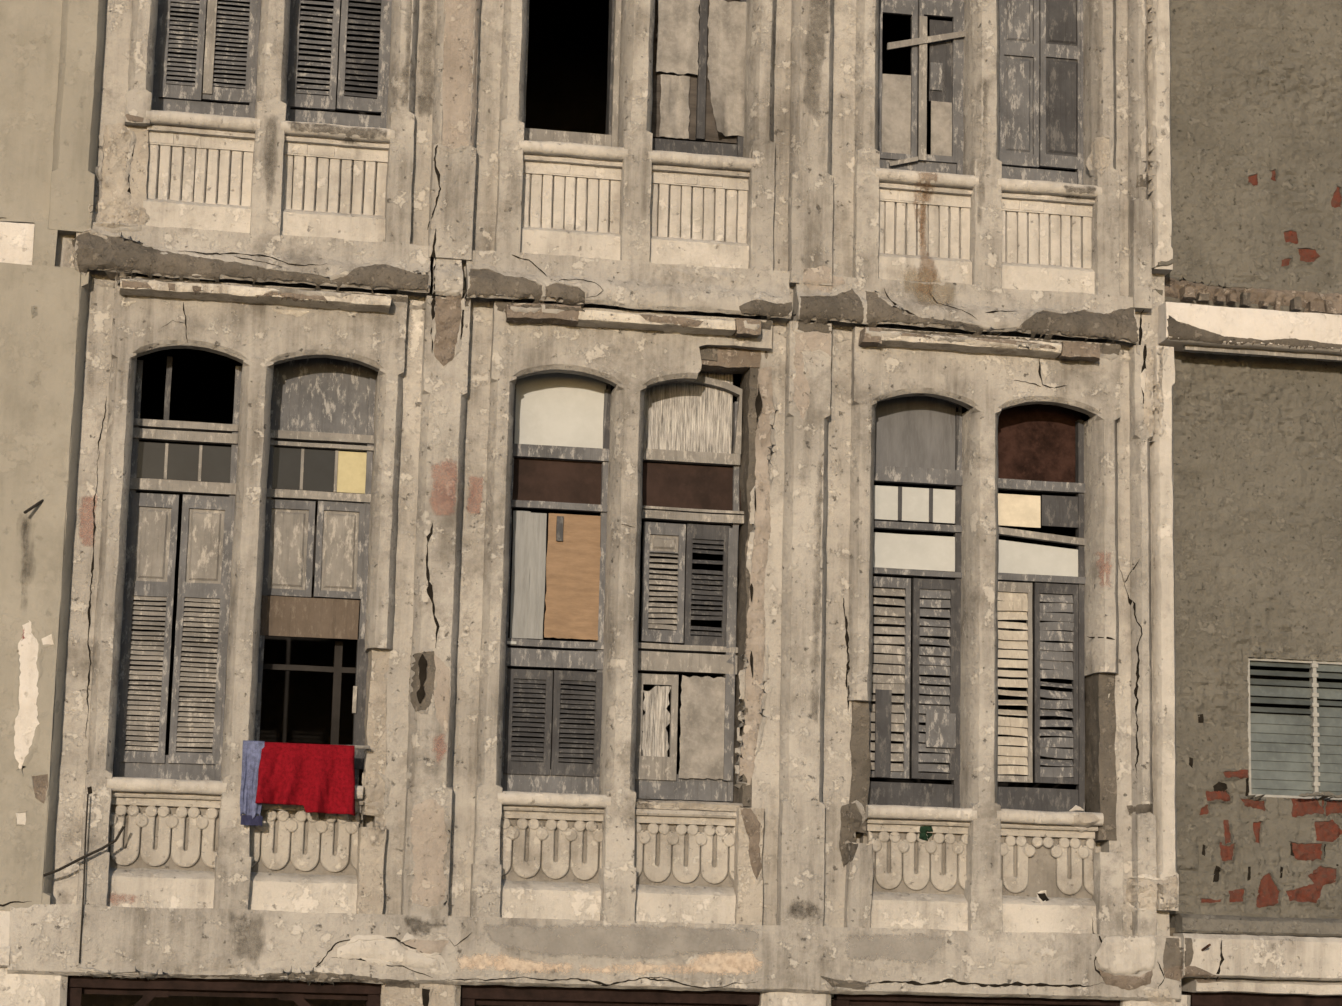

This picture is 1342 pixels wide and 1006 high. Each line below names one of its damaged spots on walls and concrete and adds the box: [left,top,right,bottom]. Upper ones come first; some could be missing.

spalling [69,114,589,366]
spalling [639,314,703,335]
spalling [699,259,1342,789]
crack [417,523,440,703]
peeling [13,621,55,826]
spalling [739,805,764,885]
spalling [834,800,867,867]
spalling [1127,803,1153,815]
spalling [1196,768,1342,908]
spalling [1126,874,1179,912]
peeling [76,932,761,1006]
spalling [1098,938,1226,990]